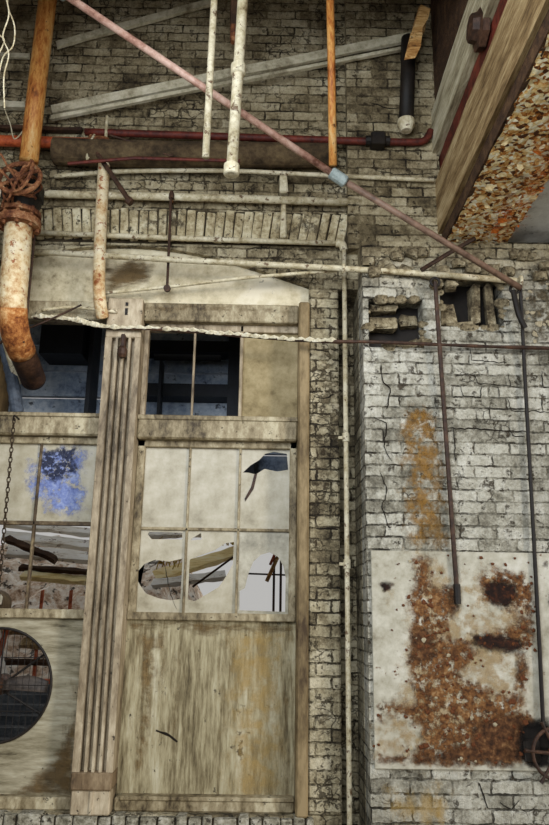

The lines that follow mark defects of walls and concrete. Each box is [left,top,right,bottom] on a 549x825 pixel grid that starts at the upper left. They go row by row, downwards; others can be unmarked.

spalling [361,246,428,278]
spalling [361,294,432,351]
spalling [420,137,549,343]
corrosion [372,556,537,767]